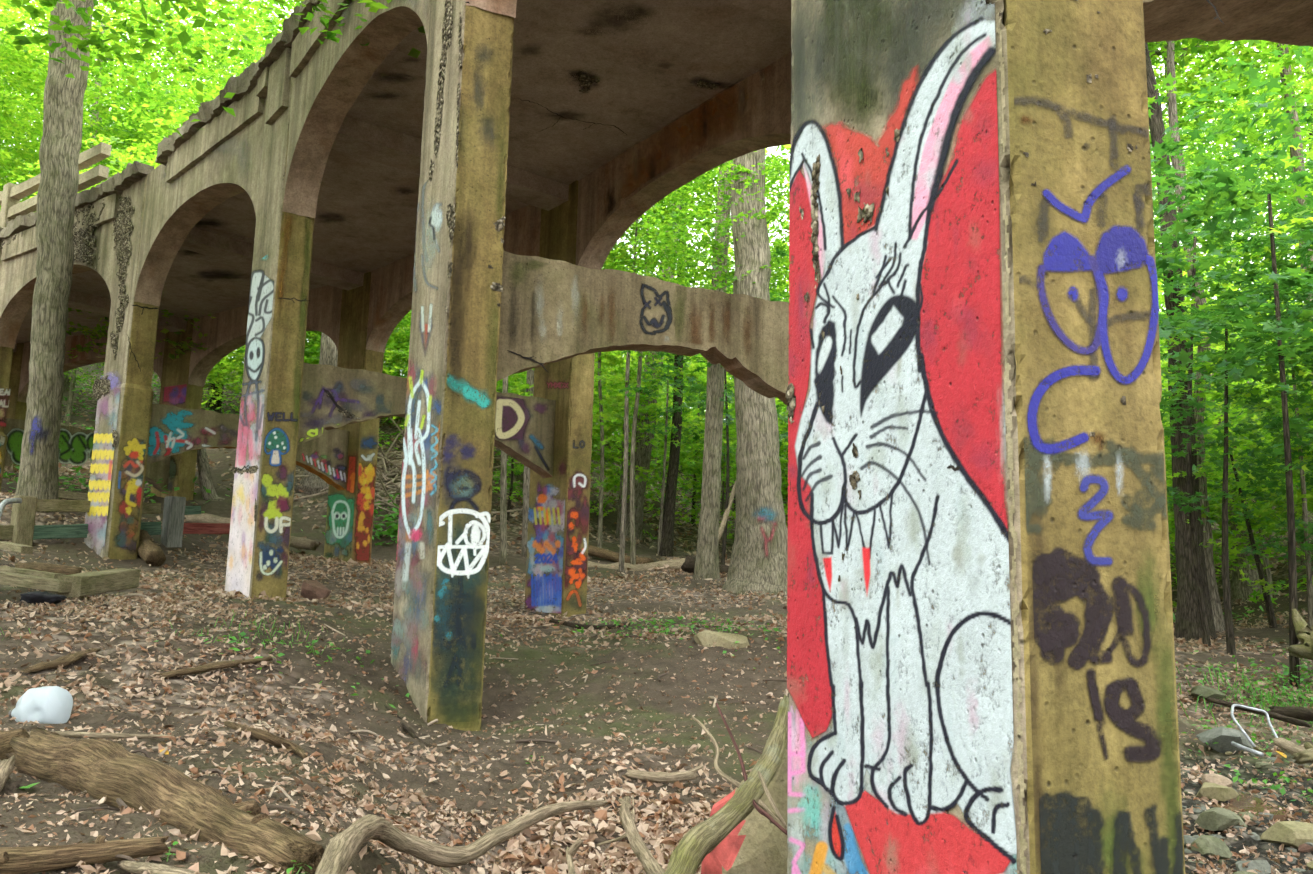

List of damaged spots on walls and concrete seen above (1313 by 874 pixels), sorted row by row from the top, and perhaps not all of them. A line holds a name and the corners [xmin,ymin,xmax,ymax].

damp [791,0,994,133]
spalling [785,383,796,423]
damp [1159,652,1178,874]
damp [1102,817,1122,874]